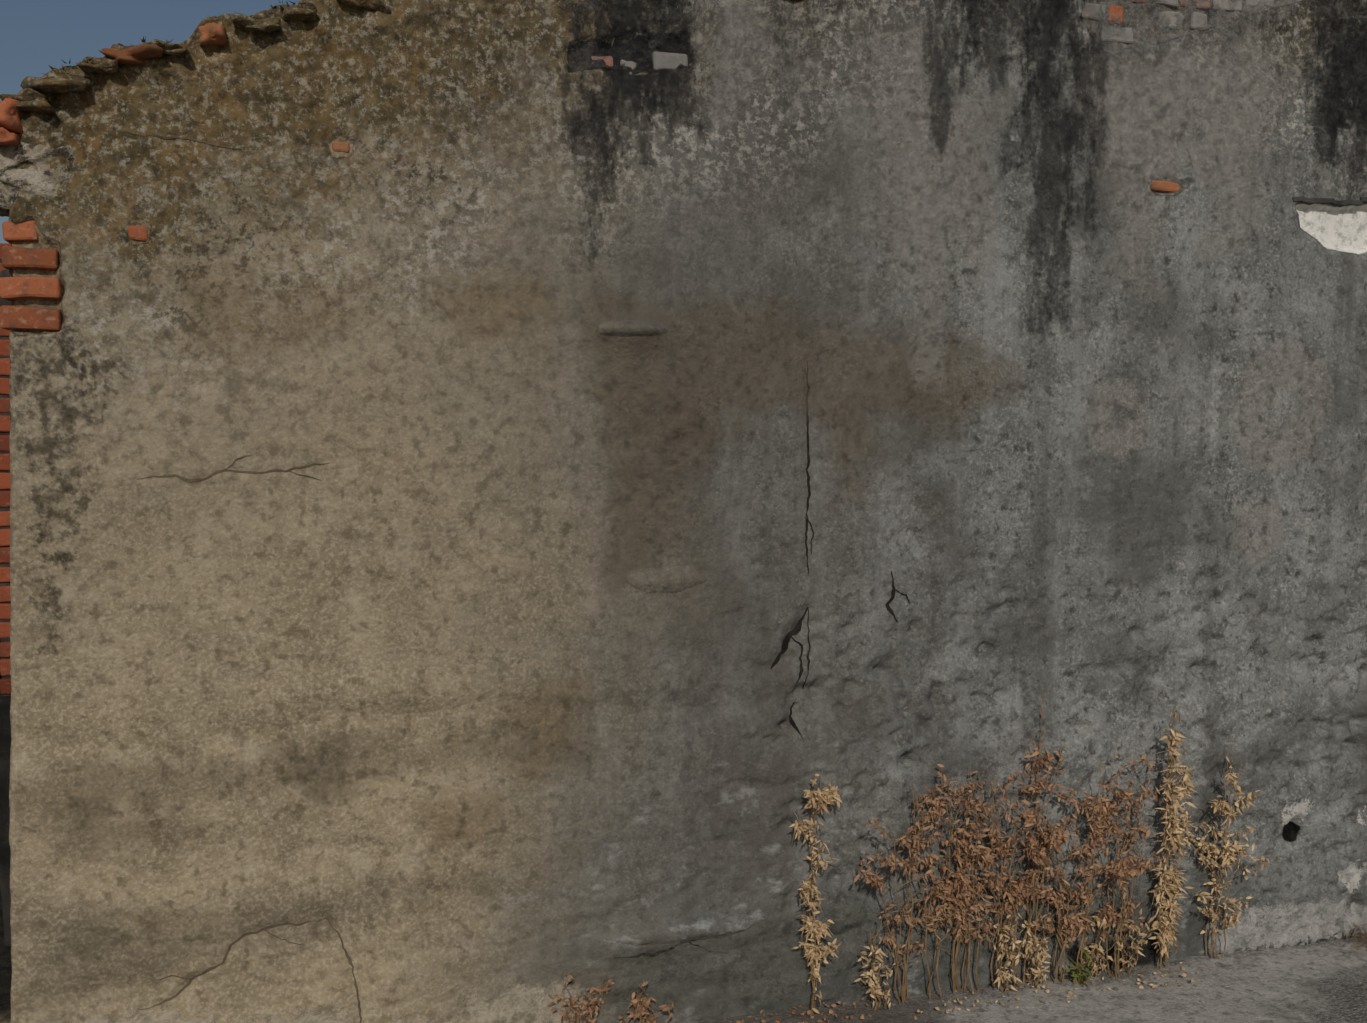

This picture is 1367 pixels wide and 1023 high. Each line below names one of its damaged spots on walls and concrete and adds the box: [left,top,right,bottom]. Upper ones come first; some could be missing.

spalling [568,31,694,73]
spalling [1081,0,1303,54]
spalling [1292,196,1367,254]
crack [139,455,330,482]
crack [771,360,814,739]
peeling [1279,799,1316,842]
peeling [1337,859,1367,893]
crack [137,918,362,1023]